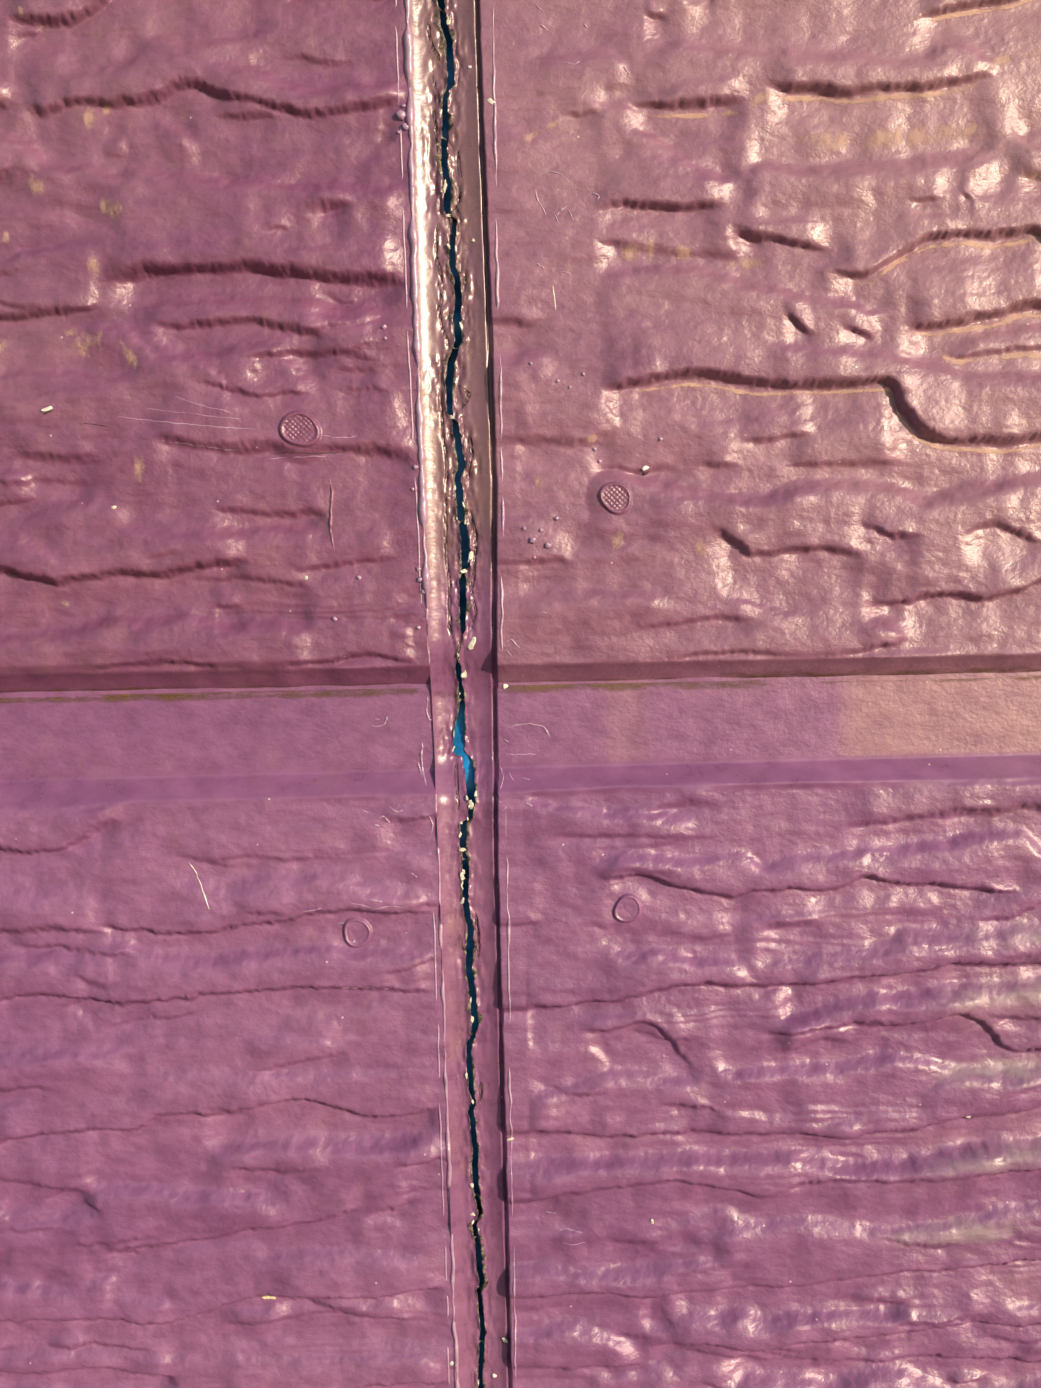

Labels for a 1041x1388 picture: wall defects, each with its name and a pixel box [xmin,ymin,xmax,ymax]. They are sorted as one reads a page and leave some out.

crack [427,0,489,1388]